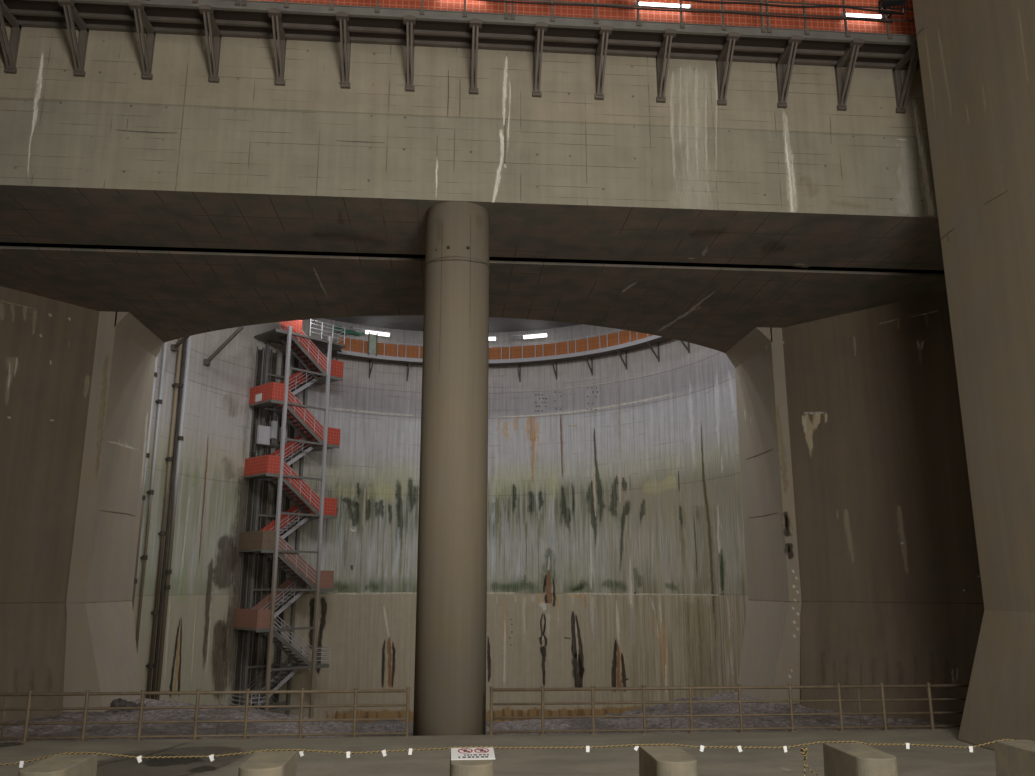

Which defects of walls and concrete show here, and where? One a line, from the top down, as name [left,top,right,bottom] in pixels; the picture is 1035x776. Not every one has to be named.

damp [167,476,273,697]
damp [309,598,327,673]
damp [524,549,556,685]
damp [564,607,593,688]
damp [612,611,629,692]